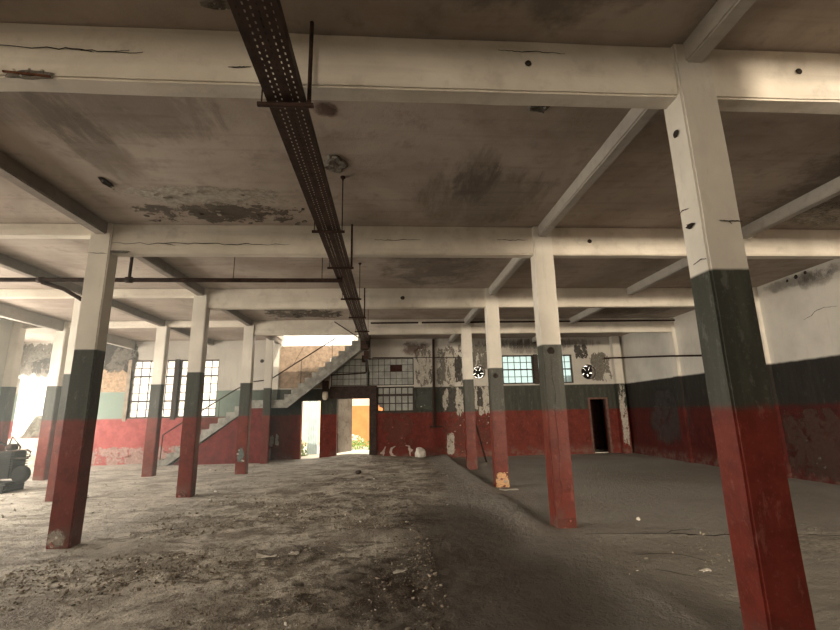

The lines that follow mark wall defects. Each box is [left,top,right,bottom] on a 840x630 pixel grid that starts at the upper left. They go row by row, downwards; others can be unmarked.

crack [4,45,142,53]
crack [88,242,282,254]
peeling [19,343,53,378]
peeling [101,344,140,392]
peeling [472,344,498,378]
peeling [574,344,612,382]
peeling [415,345,465,455]
peeling [474,385,490,425]
peeling [619,385,630,446]
spalling [496,472,510,488]
spalling [47,531,64,548]